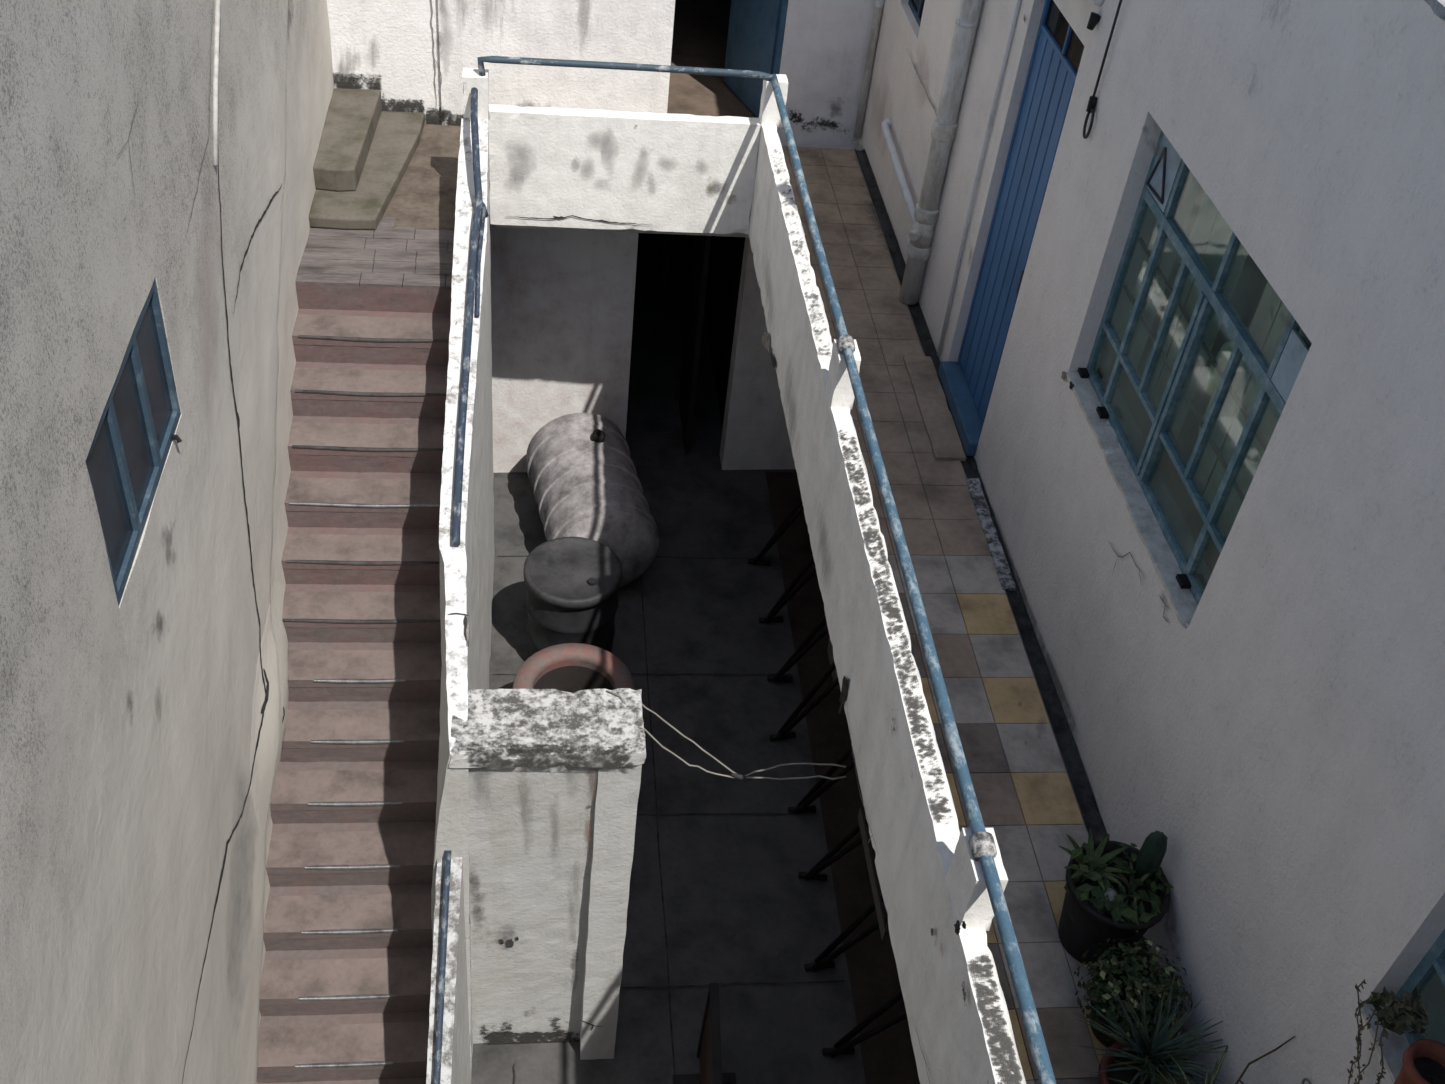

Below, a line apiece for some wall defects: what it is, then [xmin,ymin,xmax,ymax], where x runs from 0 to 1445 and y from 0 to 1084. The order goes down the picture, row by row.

crack [116,104,138,196]
crack [516,215,646,225]
peeling [772,149,832,356]
crack [182,13,285,1083]
peeling [838,429,952,822]
crack [1109,542,1169,622]
peeling [970,955,1022,1084]